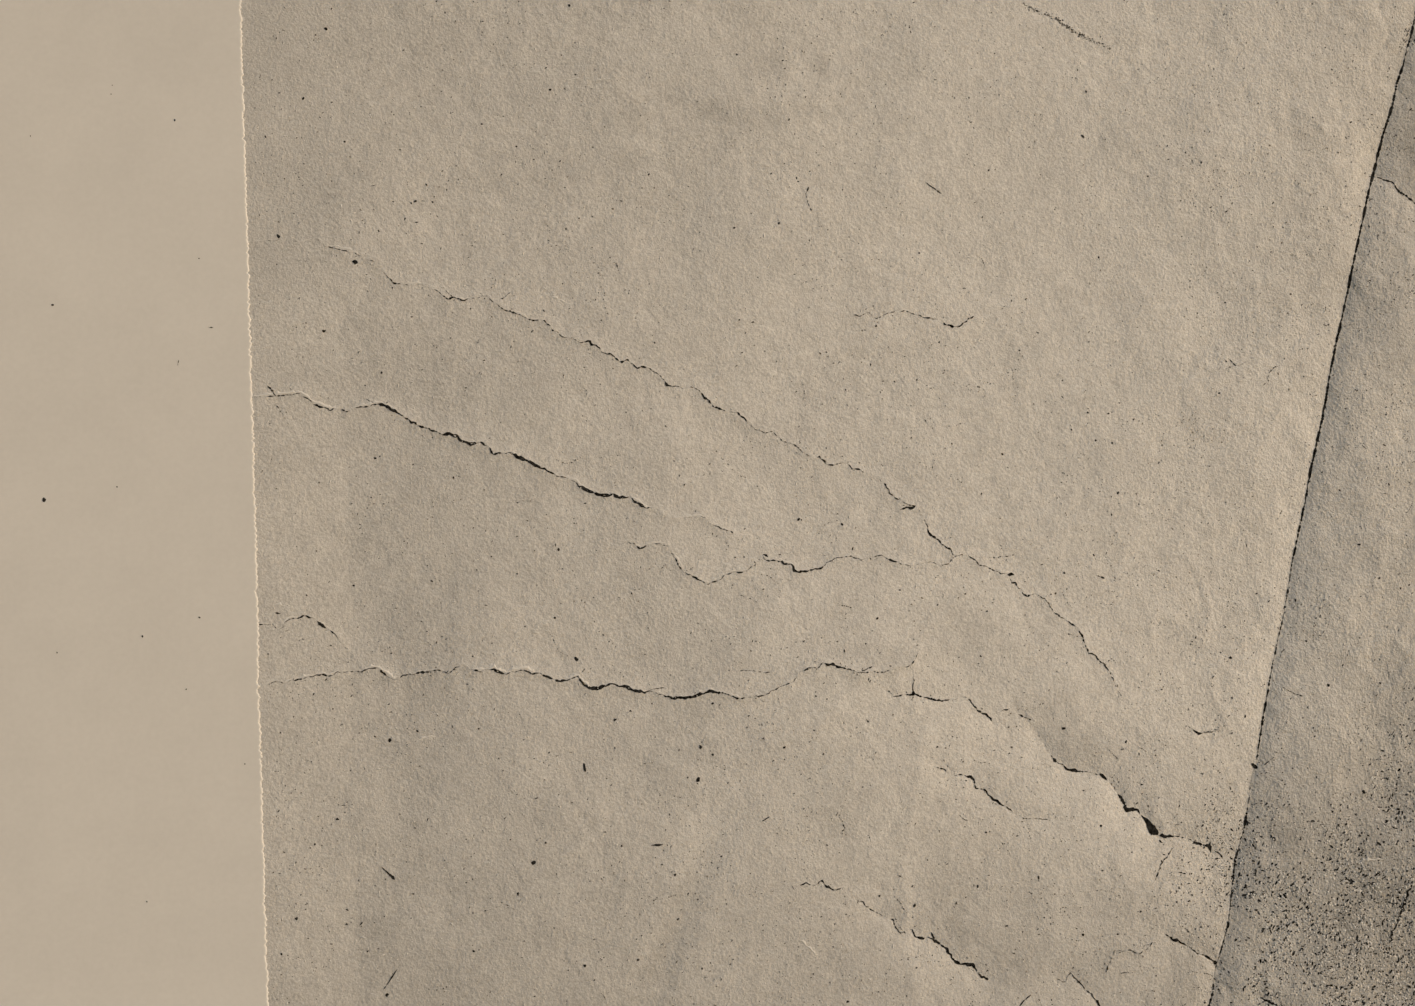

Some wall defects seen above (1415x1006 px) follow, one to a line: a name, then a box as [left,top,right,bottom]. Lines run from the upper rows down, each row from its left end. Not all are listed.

crack [1377,177,1415,204]
crack [249,237,1122,696]
crack [259,612,1223,884]
crack [792,880,994,980]
crack [1389,881,1413,938]
crack [1058,934,1217,1006]
crack [1260,997,1283,1006]